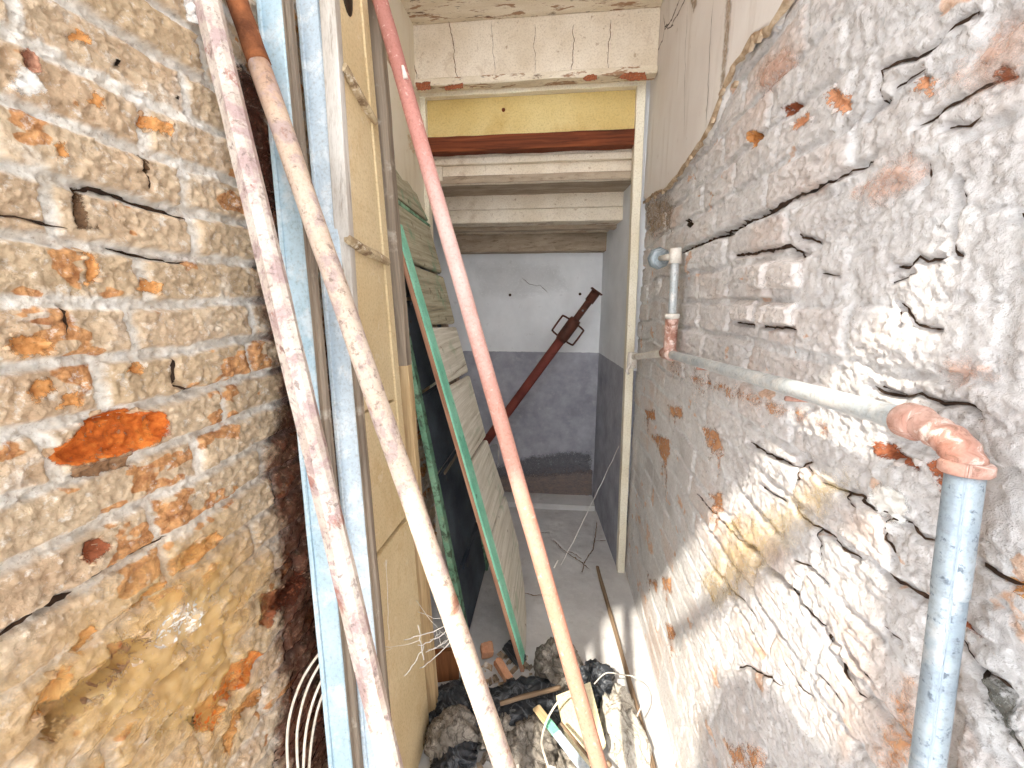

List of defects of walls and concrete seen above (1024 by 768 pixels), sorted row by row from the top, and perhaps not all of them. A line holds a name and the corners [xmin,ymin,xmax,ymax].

crack [72,176,185,221]
leakage [236,64,279,241]
peeling [619,72,647,81]
crack [683,161,874,276]
spalling [823,83,852,117]
spalling [26,377,170,478]
leakage [325,345,340,500]
leakage [153,599,204,648]
leakage [264,359,328,768]
crack [739,486,870,704]
crack [751,442,935,599]
spalling [190,650,266,756]